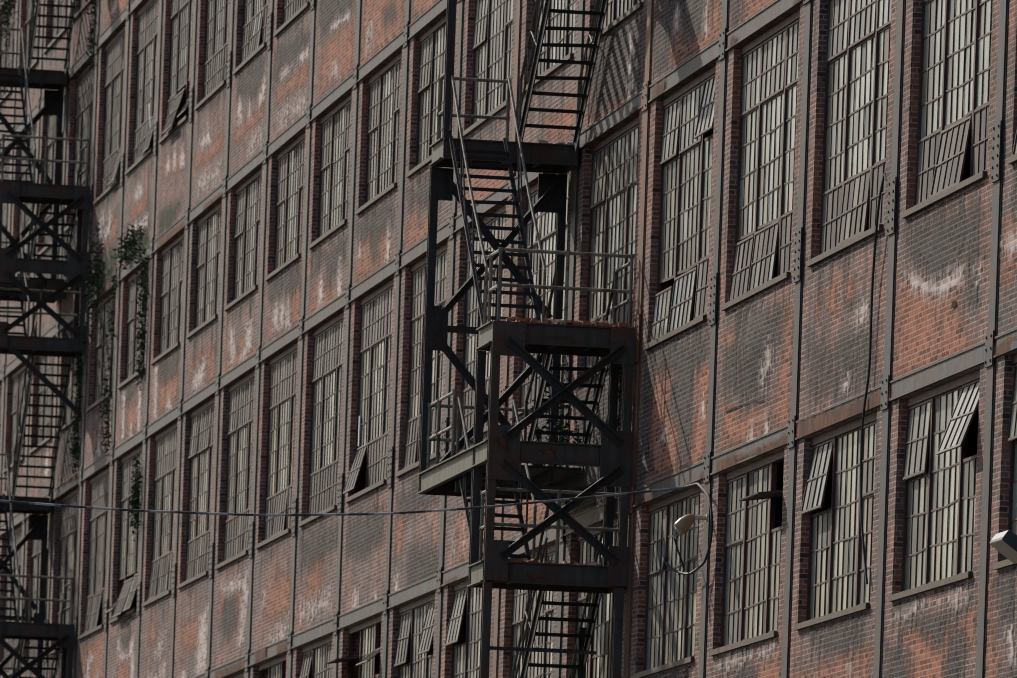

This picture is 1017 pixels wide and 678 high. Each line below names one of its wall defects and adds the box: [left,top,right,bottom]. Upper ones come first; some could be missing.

damp [277,14,309,81]
damp [331,10,351,31]
damp [164,92,225,176]
damp [237,52,266,157]
efflorescence [97,187,117,243]
damp [128,158,152,238]
efflorescence [1005,232,1017,258]
damp [906,253,981,307]
damp [79,633,98,678]
damp [117,619,135,678]
damp [181,577,209,678]
damp [220,557,249,650]